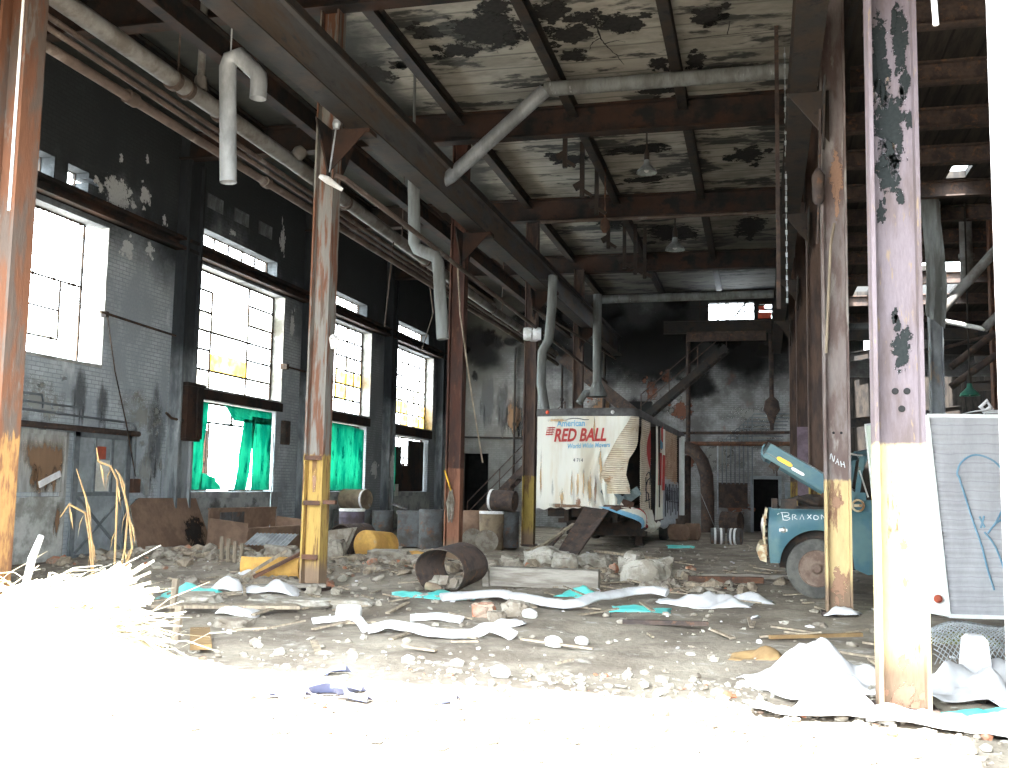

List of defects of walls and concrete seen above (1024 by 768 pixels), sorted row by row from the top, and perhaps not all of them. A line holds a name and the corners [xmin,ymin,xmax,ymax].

peeling [405,0,529,60]
peeling [532,0,655,62]
peeling [689,2,731,28]
peeling [647,57,670,72]
peeling [685,48,707,70]
peeling [636,87,676,98]
peeling [872,2,912,224]
peeling [544,143,672,167]
peeling [93,172,152,211]
peeling [615,175,670,185]
rust [828,147,844,221]
peeling [890,307,913,374]